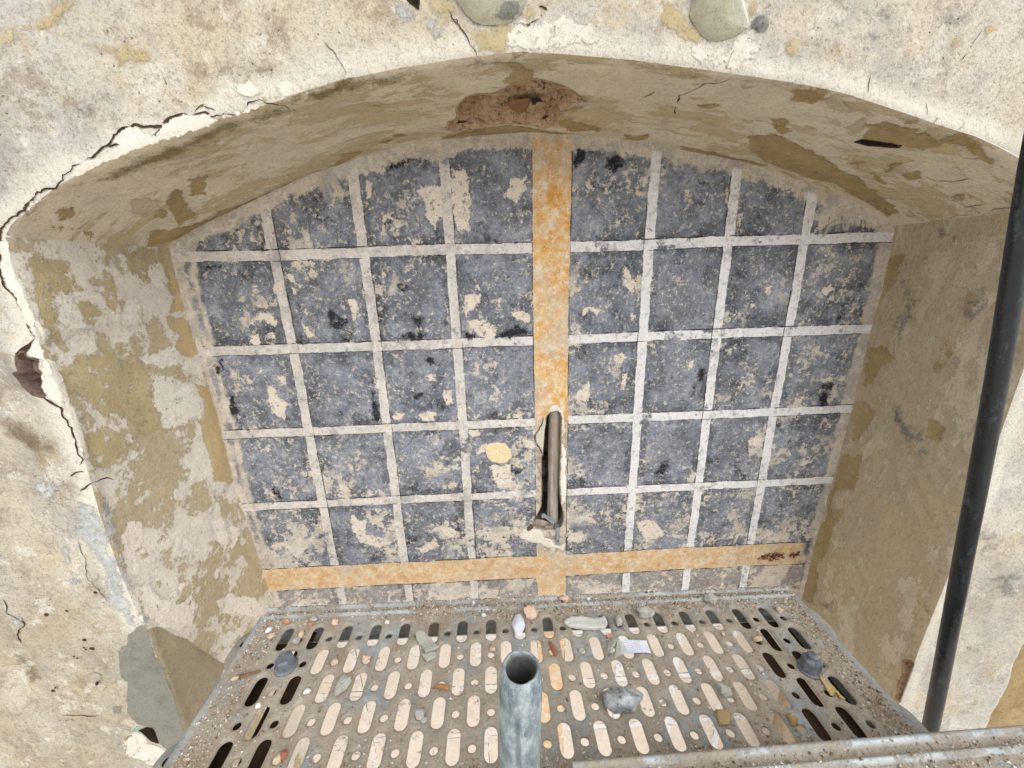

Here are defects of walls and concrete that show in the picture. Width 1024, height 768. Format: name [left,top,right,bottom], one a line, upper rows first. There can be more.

crack [447,0,477,55]
spalling [66,79,303,182]
spalling [439,62,601,141]
peeling [680,118,922,217]
peeling [846,117,1003,168]
crack [0,99,290,360]
peeling [0,175,302,483]
crack [44,398,114,491]
spalling [522,405,567,504]
peeling [349,515,393,548]
spalling [512,525,585,551]
crack [3,599,25,642]